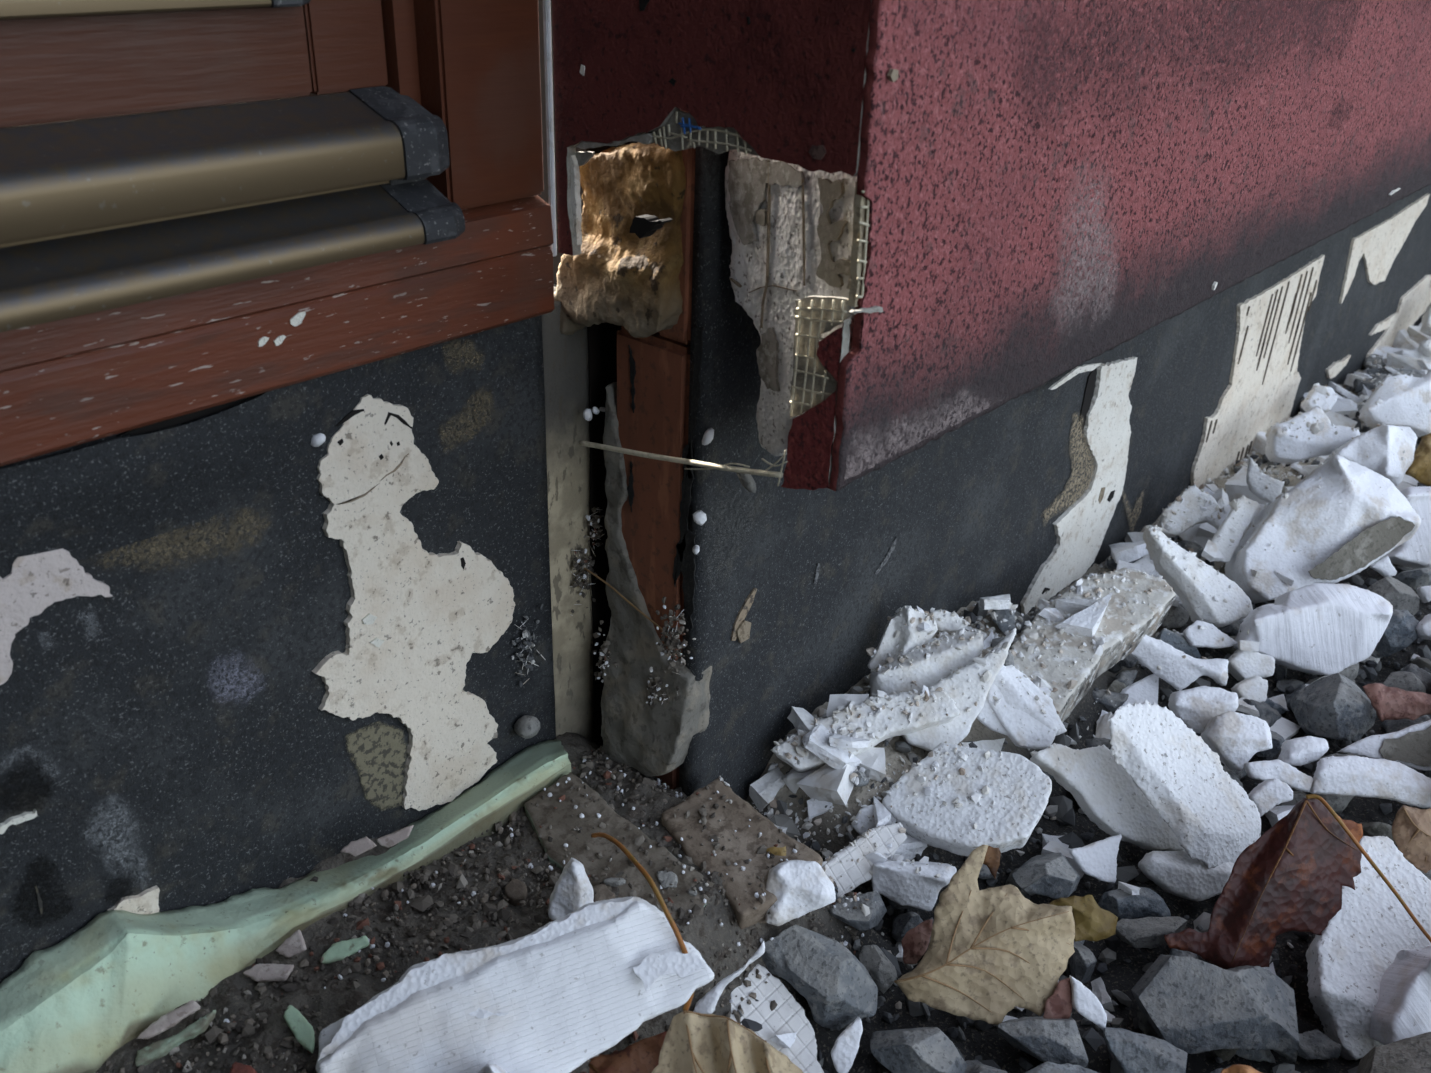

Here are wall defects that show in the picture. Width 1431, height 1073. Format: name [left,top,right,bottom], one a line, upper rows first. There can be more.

spalling [728,157,851,391]
peeling [1020,357,1137,615]
peeling [1190,255,1325,489]
peeling [1326,275,1431,379]
peeling [1339,193,1430,304]
peeling [0,549,113,685]
peeling [312,394,515,856]